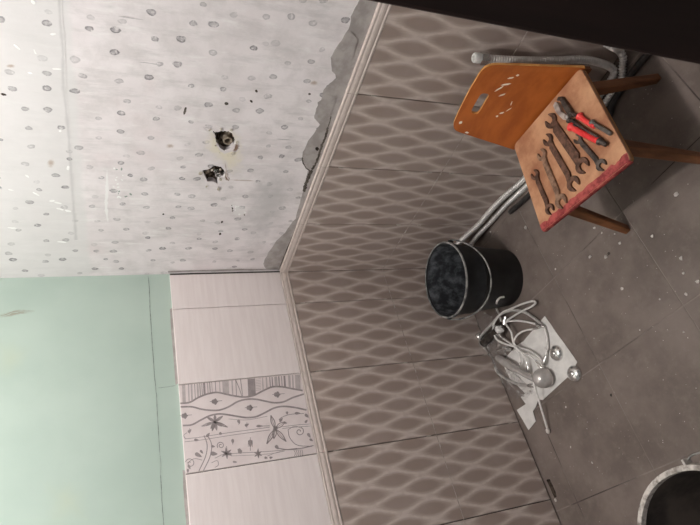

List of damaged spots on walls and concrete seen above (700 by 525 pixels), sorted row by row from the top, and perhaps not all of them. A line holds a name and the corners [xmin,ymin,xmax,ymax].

spalling [209,128,238,155]
spalling [199,166,227,190]